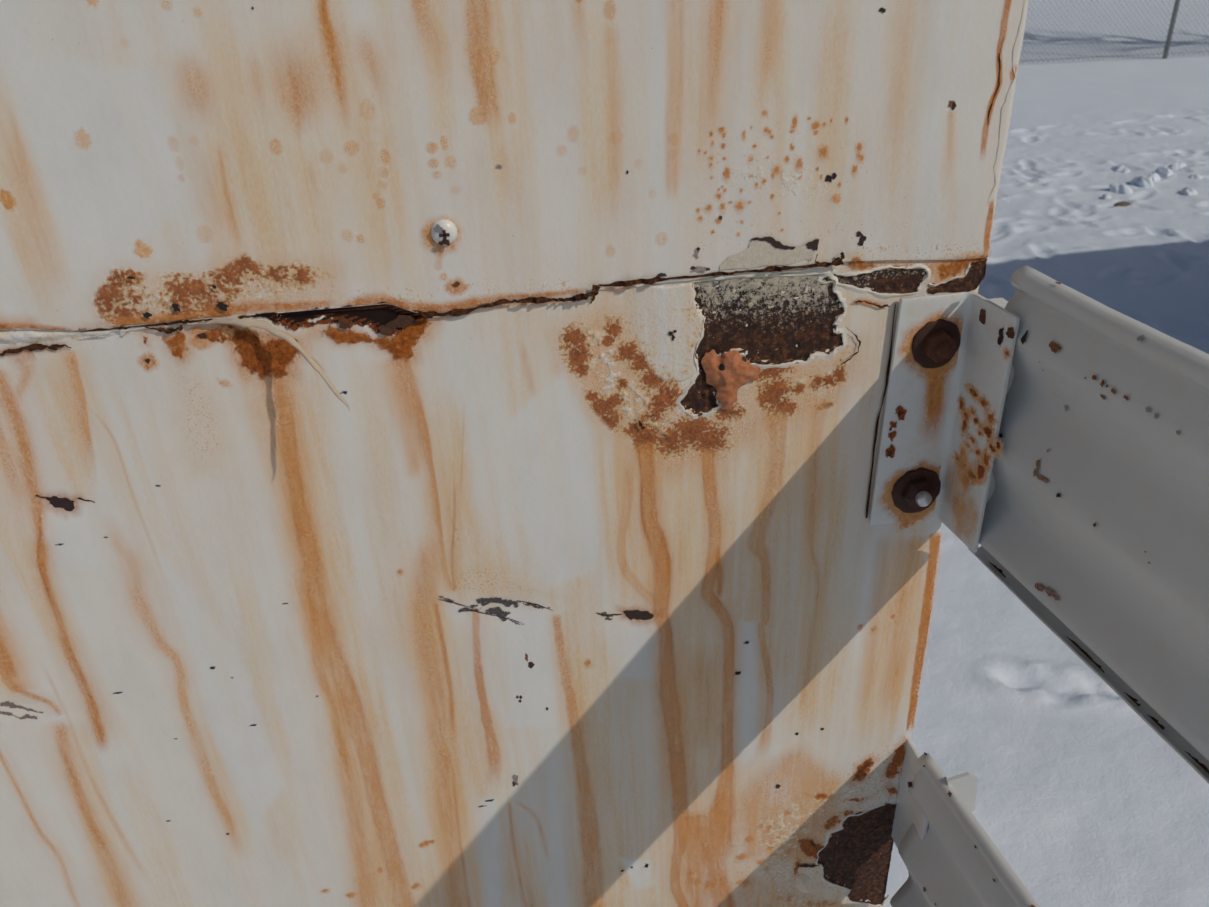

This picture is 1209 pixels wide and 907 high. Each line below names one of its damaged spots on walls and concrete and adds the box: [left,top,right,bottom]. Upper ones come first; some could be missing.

crack [0,252,845,356]
spalling [614,236,987,419]
corrosion [902,313,962,425]
corrosion [113,280,577,588]
corrosion [885,406,906,458]
corrosion [954,386,1002,490]
peeling [35,495,95,512]
corrosion [0,376,104,741]
peeling [597,610,654,620]
corrosion [907,534,941,729]
corrosion [853,745,905,795]
spalling [796,802,896,907]